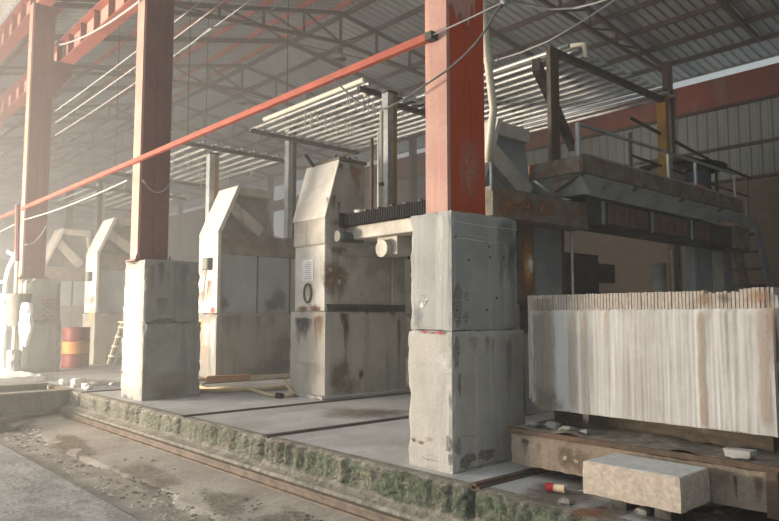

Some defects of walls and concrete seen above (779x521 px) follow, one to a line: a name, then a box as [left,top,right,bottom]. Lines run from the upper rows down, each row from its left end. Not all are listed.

corrosion [323,248,347,296]
corrosion [298,306,322,335]
spalling [446,436,494,469]